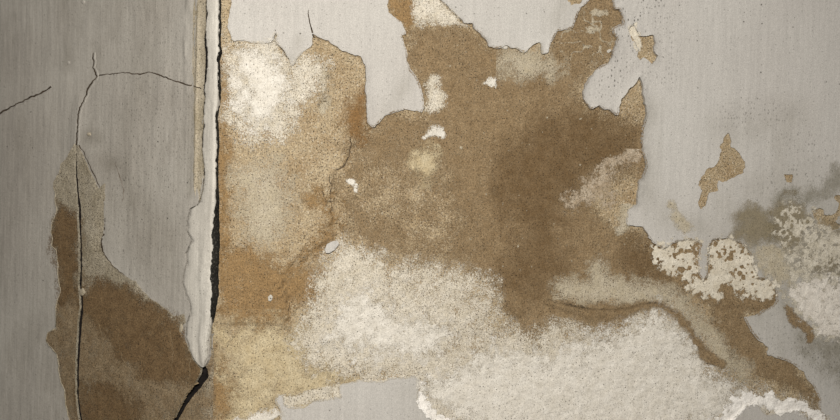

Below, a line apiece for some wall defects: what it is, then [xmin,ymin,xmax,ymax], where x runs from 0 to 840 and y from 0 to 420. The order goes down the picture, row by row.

crack [0,86,53,117]
crack [76,2,210,420]
peeling [183,0,827,420]
damp [206,0,840,420]